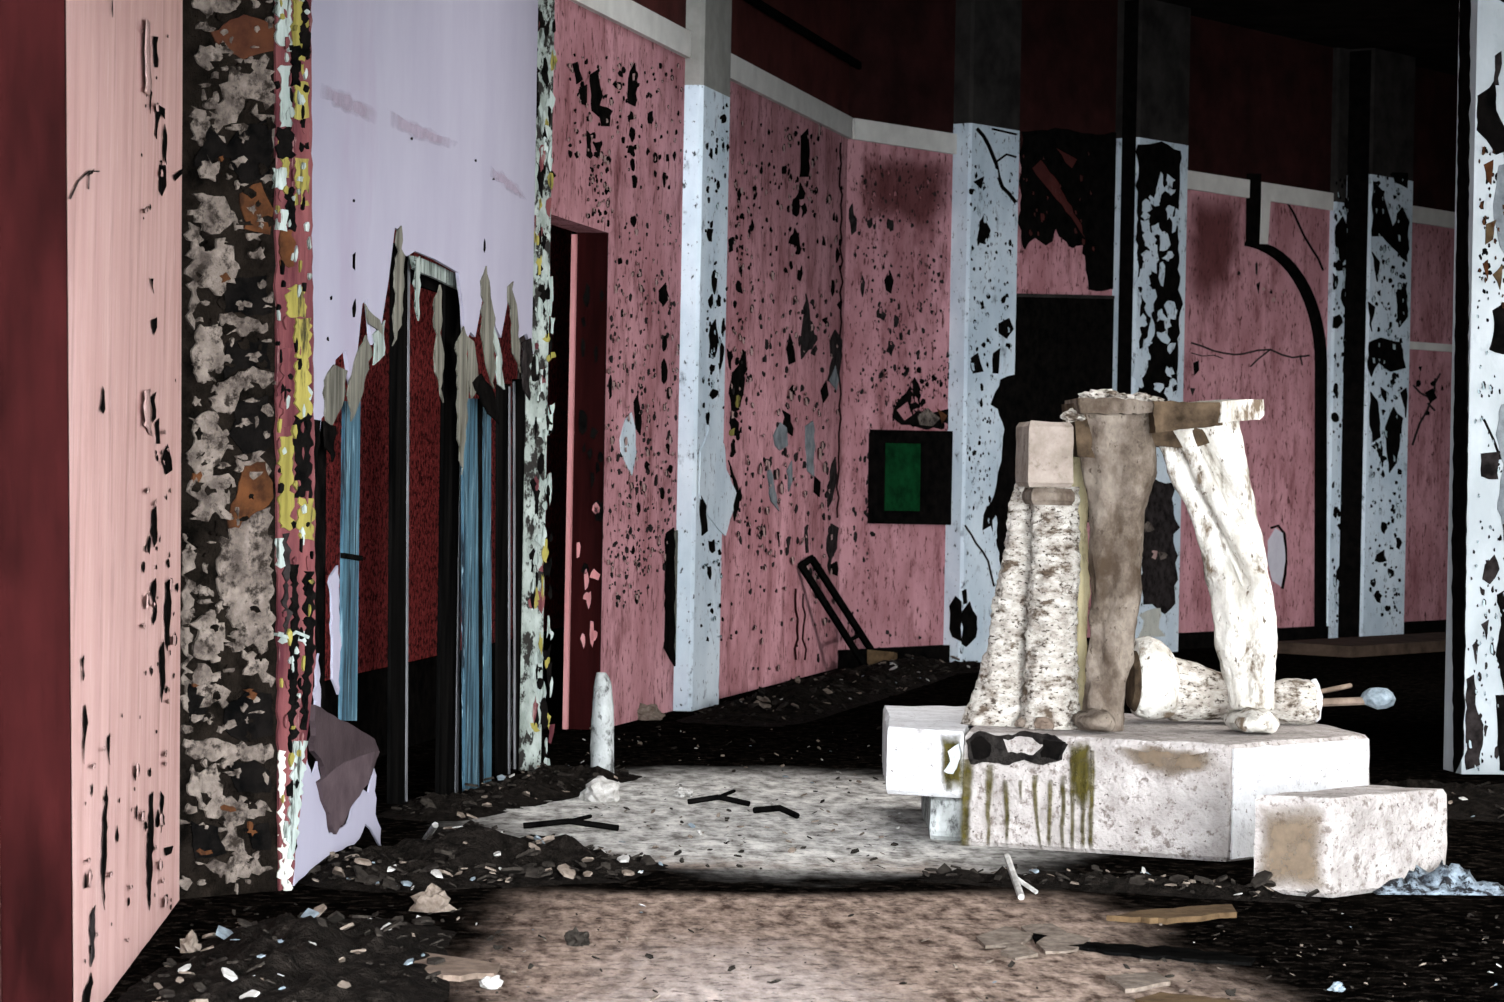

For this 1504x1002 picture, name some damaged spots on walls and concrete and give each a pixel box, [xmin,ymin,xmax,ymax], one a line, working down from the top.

peeling [967,0,1199,565]
peeling [698,103,950,663]
flaking render [1331,0,1504,773]
spalling [83,0,683,1002]
spalling [949,589,977,647]
spalling [1138,479,1180,638]
peeling [671,787,693,798]
spalling [944,731,1068,774]
leakage [947,749,1095,847]